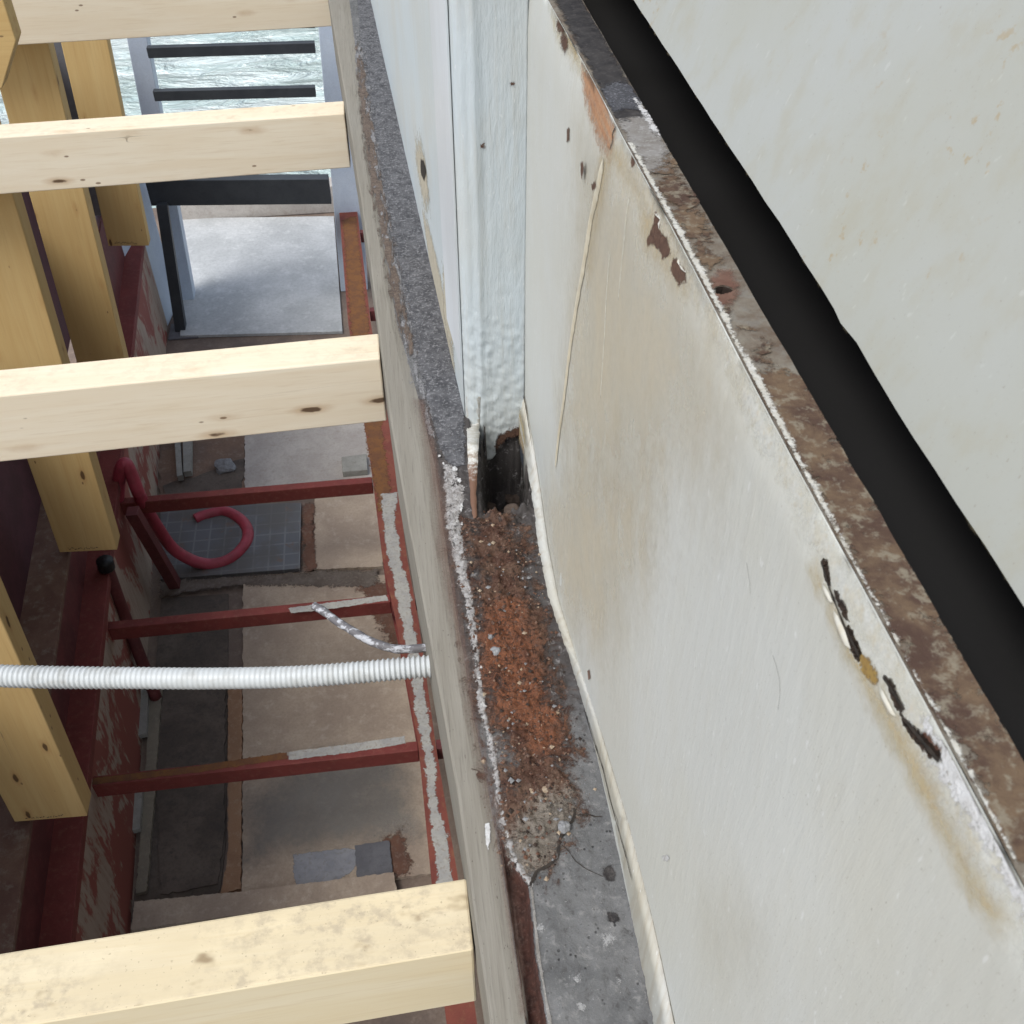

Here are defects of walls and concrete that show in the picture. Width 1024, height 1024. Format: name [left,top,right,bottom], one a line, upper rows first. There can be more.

corrosion [555,21,615,466]
corrosion [649,152,729,271]
water stain [438,455,536,888]
crack [529,711,632,886]
corrosion [720,306,1024,863]